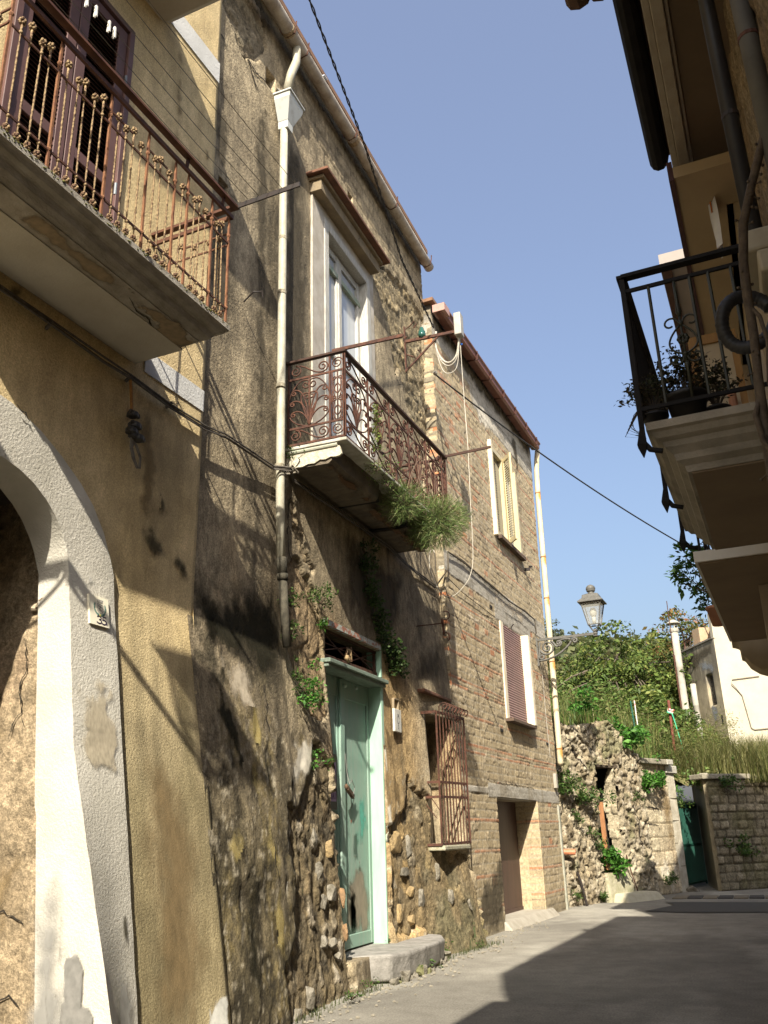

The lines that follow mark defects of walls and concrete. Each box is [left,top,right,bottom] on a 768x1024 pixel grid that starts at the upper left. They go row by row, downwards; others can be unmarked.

damp [141,416,165,511]
damp [147,530,162,555]
crack [8,639,27,738]
peeling [84,682,117,770]
spalling [285,744,368,1023]
peeling [60,954,93,1024]